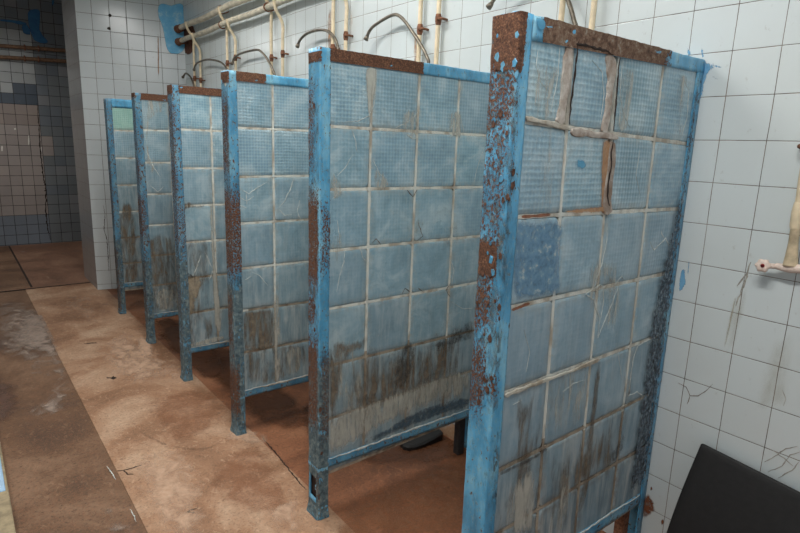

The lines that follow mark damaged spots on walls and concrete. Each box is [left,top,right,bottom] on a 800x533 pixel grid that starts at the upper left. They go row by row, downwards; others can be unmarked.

rust [543,17,672,66]
crack [536,42,630,206]
crack [37,105,51,240]
rust [131,71,267,422]
rust [308,15,424,455]
rust [469,11,528,425]
water stain [1,308,61,372]
water stain [329,372,469,462]
water stain [514,474,534,532]
water stain [581,495,640,533]
rust [643,487,654,516]